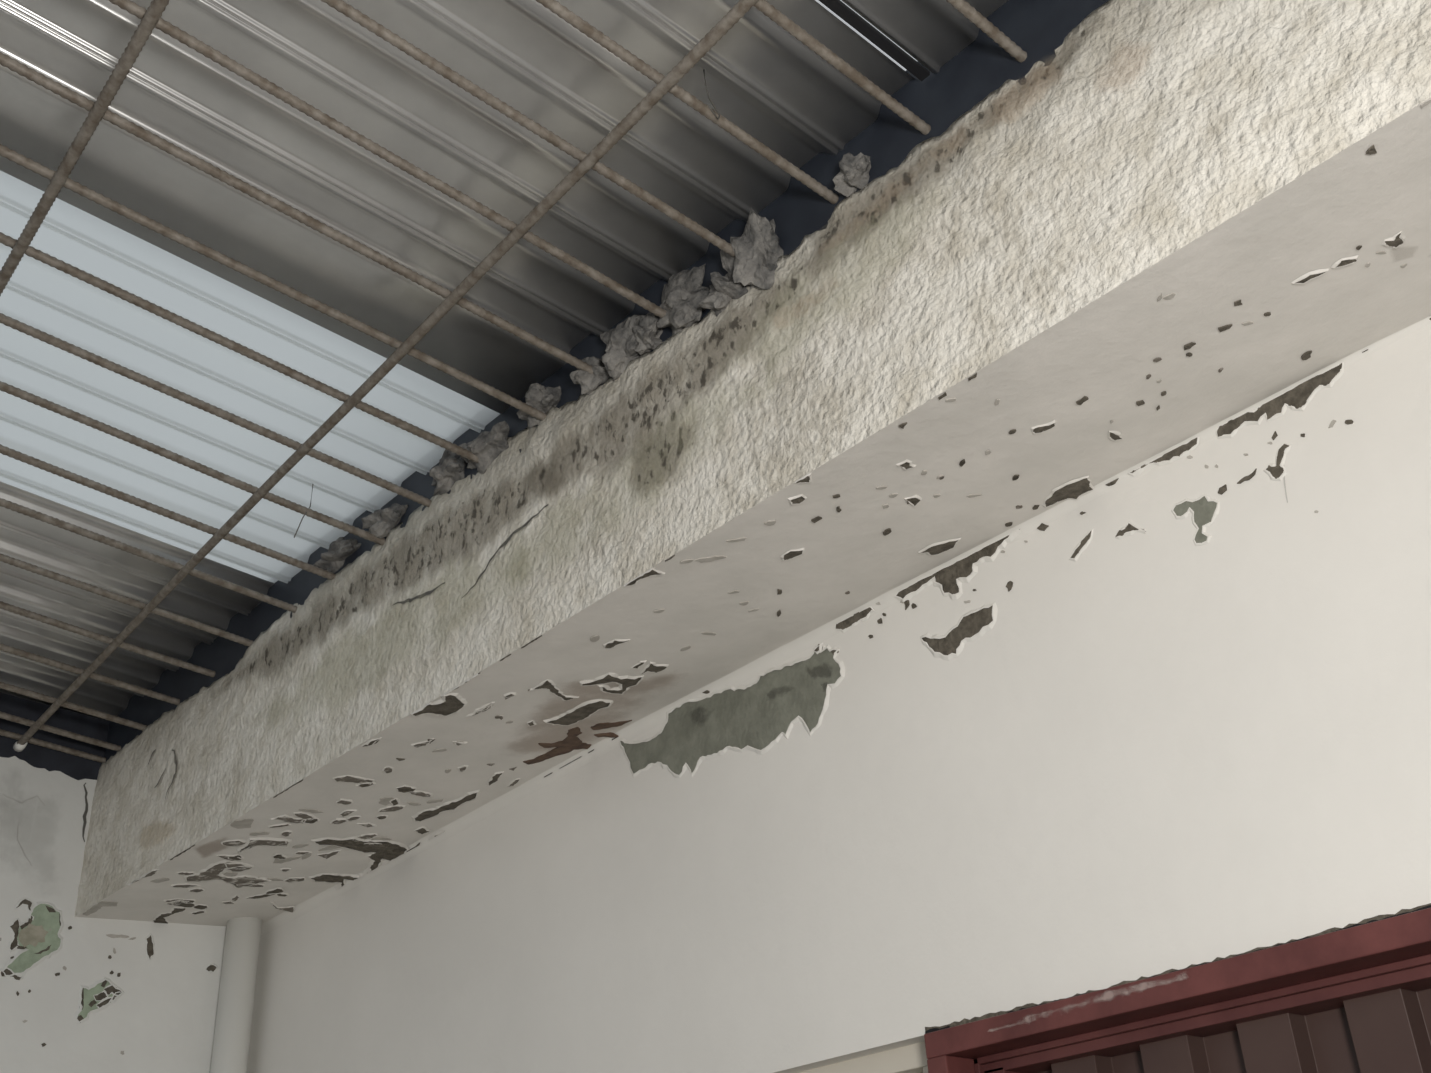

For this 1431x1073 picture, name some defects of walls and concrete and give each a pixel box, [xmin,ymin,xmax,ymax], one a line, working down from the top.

water stain [858,104,1003,225]
peeling [1291,231,1406,284]
water stain [540,266,803,489]
peeling [1218,312,1271,332]
water stain [243,482,526,674]
peeling [74,357,1344,1024]
peeling [0,898,118,996]